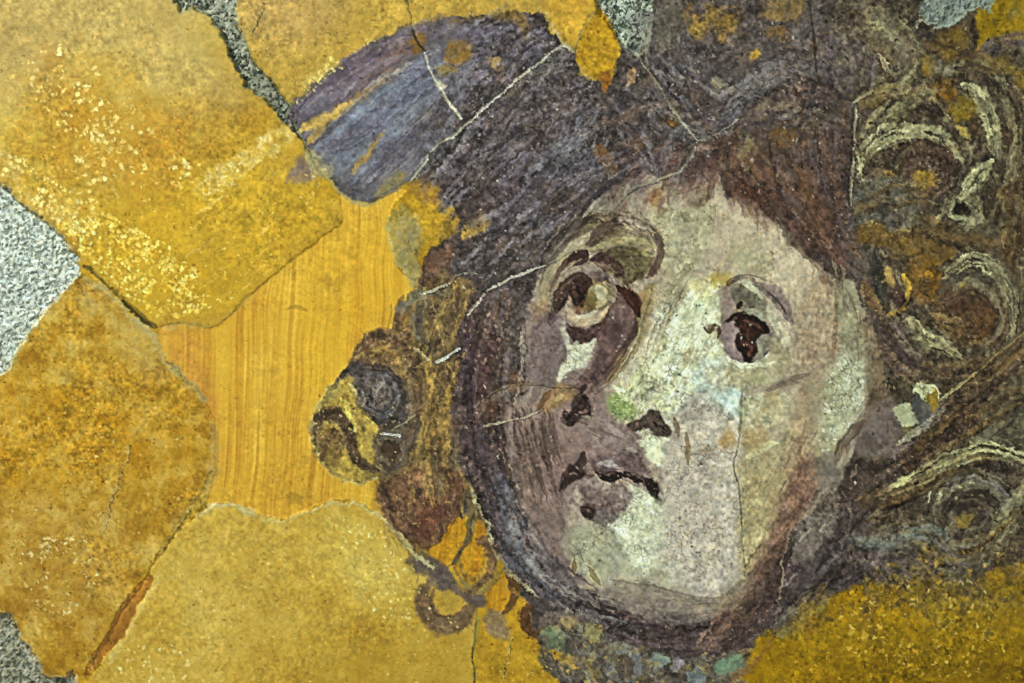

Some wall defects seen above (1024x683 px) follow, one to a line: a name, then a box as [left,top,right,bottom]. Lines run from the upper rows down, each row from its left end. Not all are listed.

flaking render [0,42,210,378]
flaking render [169,0,297,200]
crack [404,0,595,181]
crack [421,248,580,316]
flaking render [596,0,654,59]
crack [606,60,739,216]
flaking render [918,0,998,31]
crack [733,390,746,577]
flaking render [0,612,78,683]
crack [86,575,154,677]